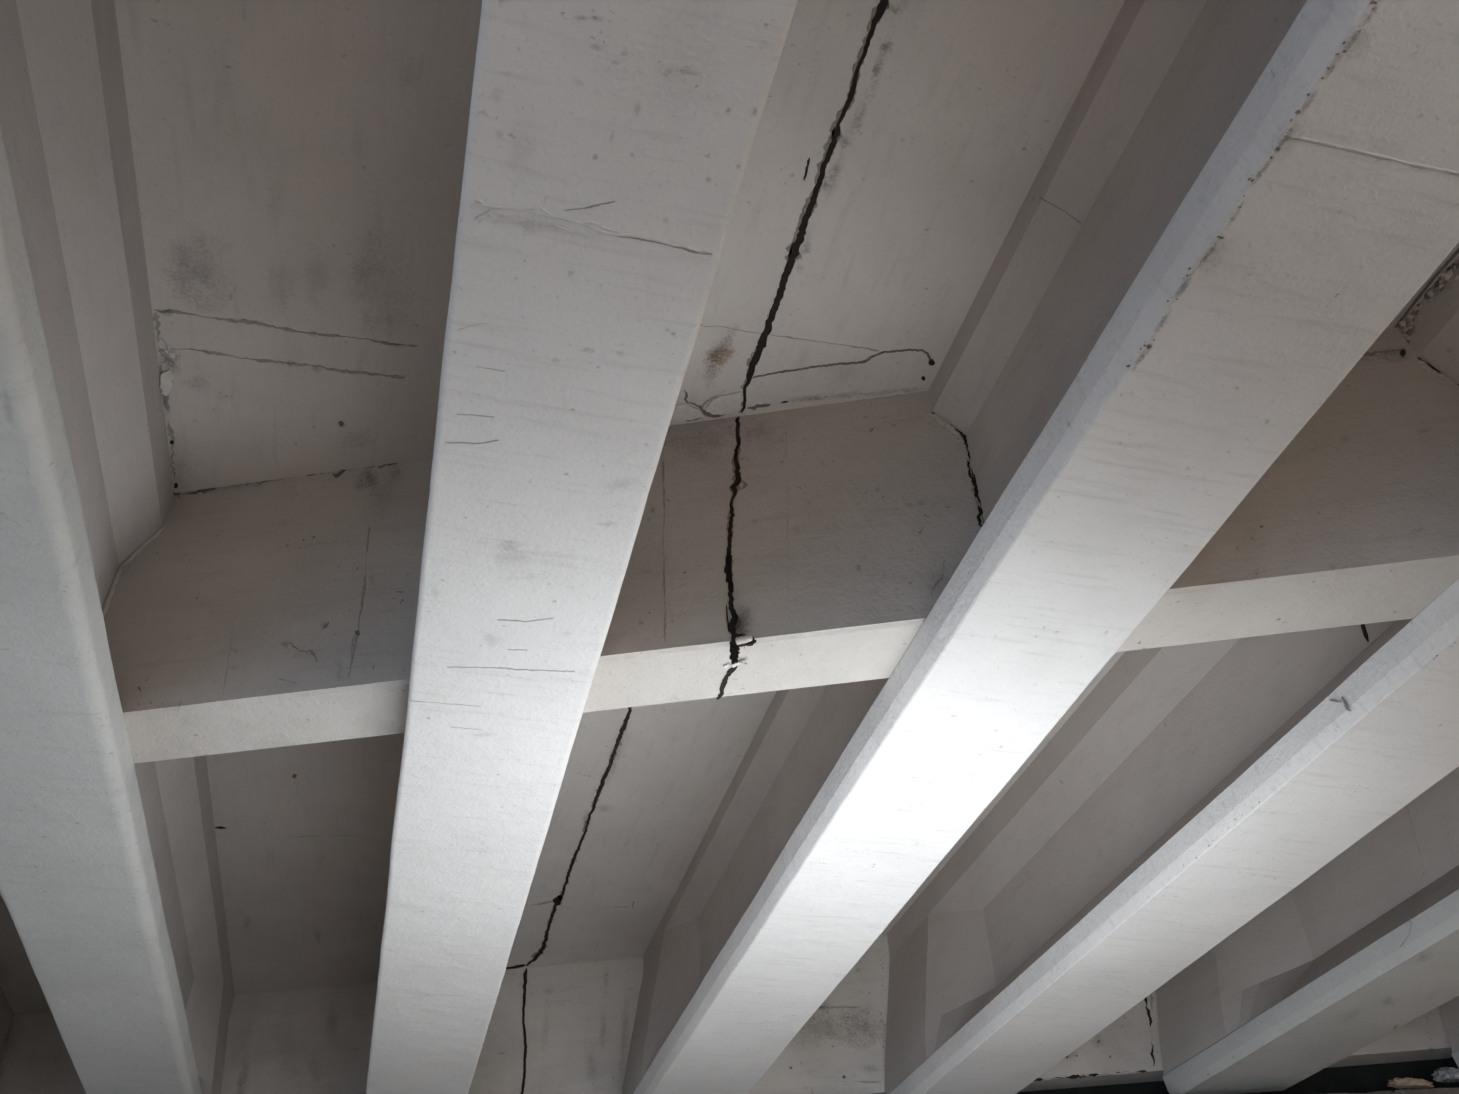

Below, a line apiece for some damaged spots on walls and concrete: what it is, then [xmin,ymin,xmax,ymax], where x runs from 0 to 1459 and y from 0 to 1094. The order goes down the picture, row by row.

crack [471,198,712,255]
crack [700,0,935,700]
crack [660,448,668,637]
crack [506,707,635,1094]
crack [784,1066,880,1090]
crack [818,1002,878,1010]